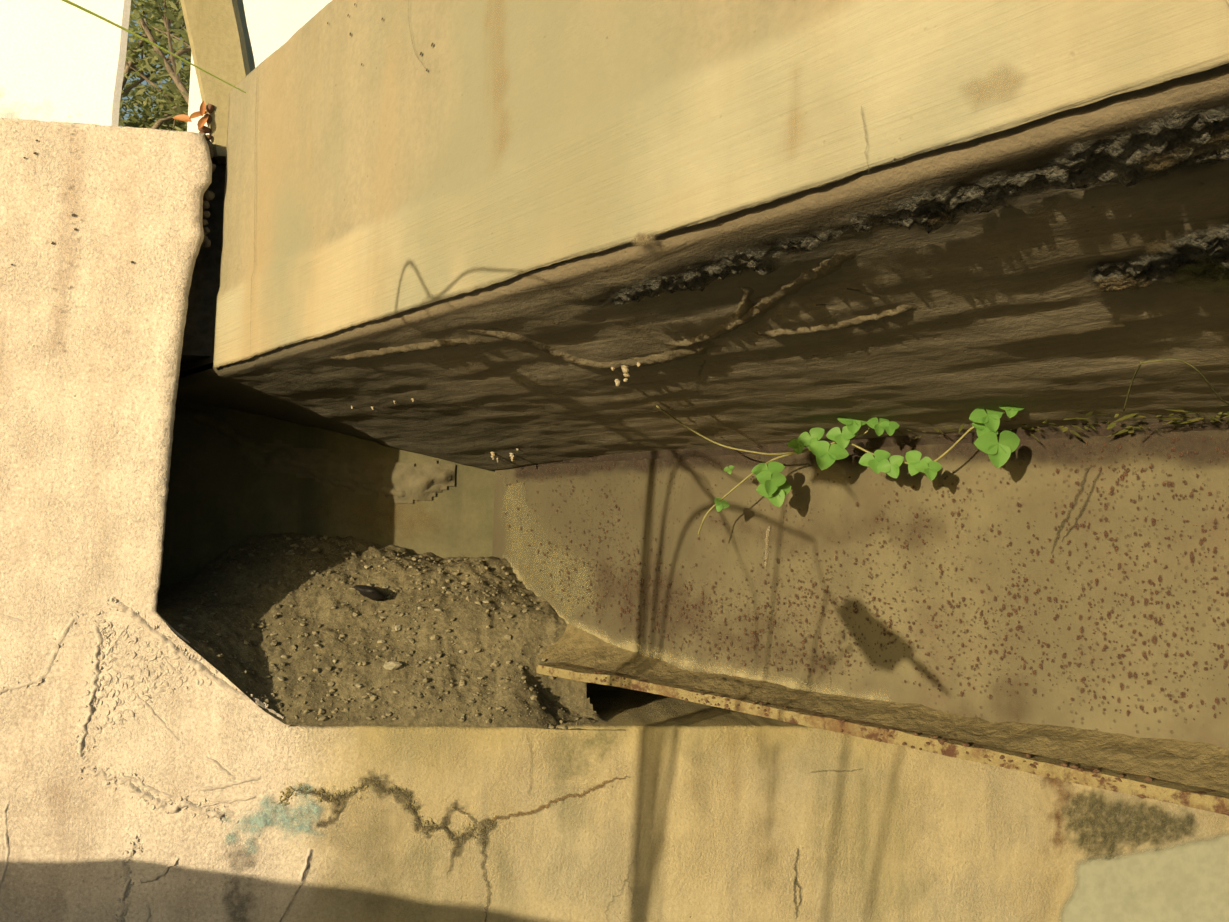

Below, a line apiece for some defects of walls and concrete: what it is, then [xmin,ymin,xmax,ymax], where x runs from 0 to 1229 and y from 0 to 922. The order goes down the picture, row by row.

spalling [612,110,1229,306]
corrosion [505,436,1229,720]
crack [271,776,630,922]
crack [793,848,801,919]